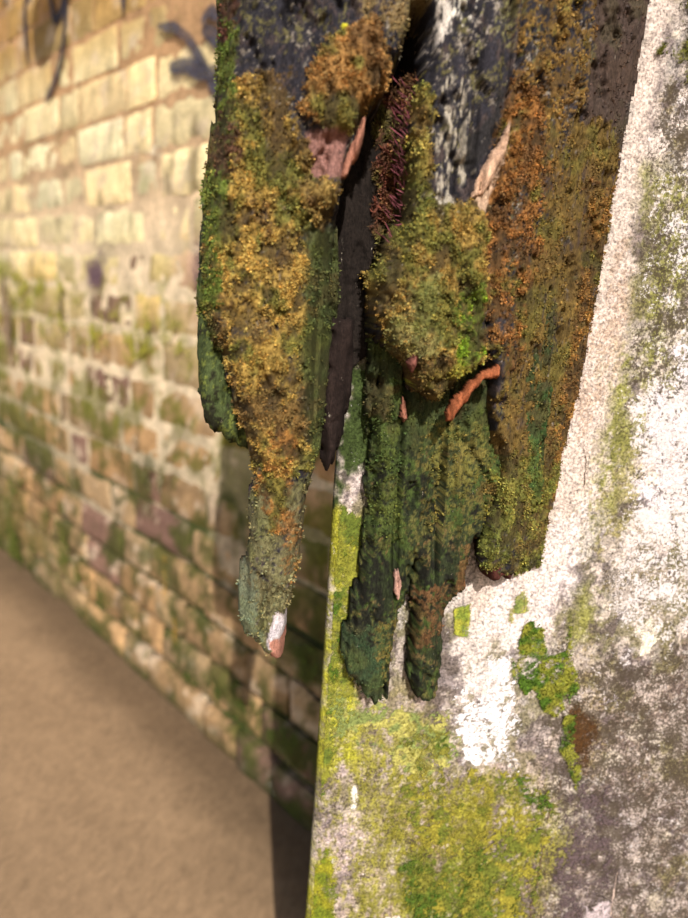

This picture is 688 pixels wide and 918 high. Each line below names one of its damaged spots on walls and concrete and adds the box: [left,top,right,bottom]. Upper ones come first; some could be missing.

water stain [0,247,192,380]
water stain [0,442,122,619]
water stain [110,442,165,525]
water stain [158,503,629,918]